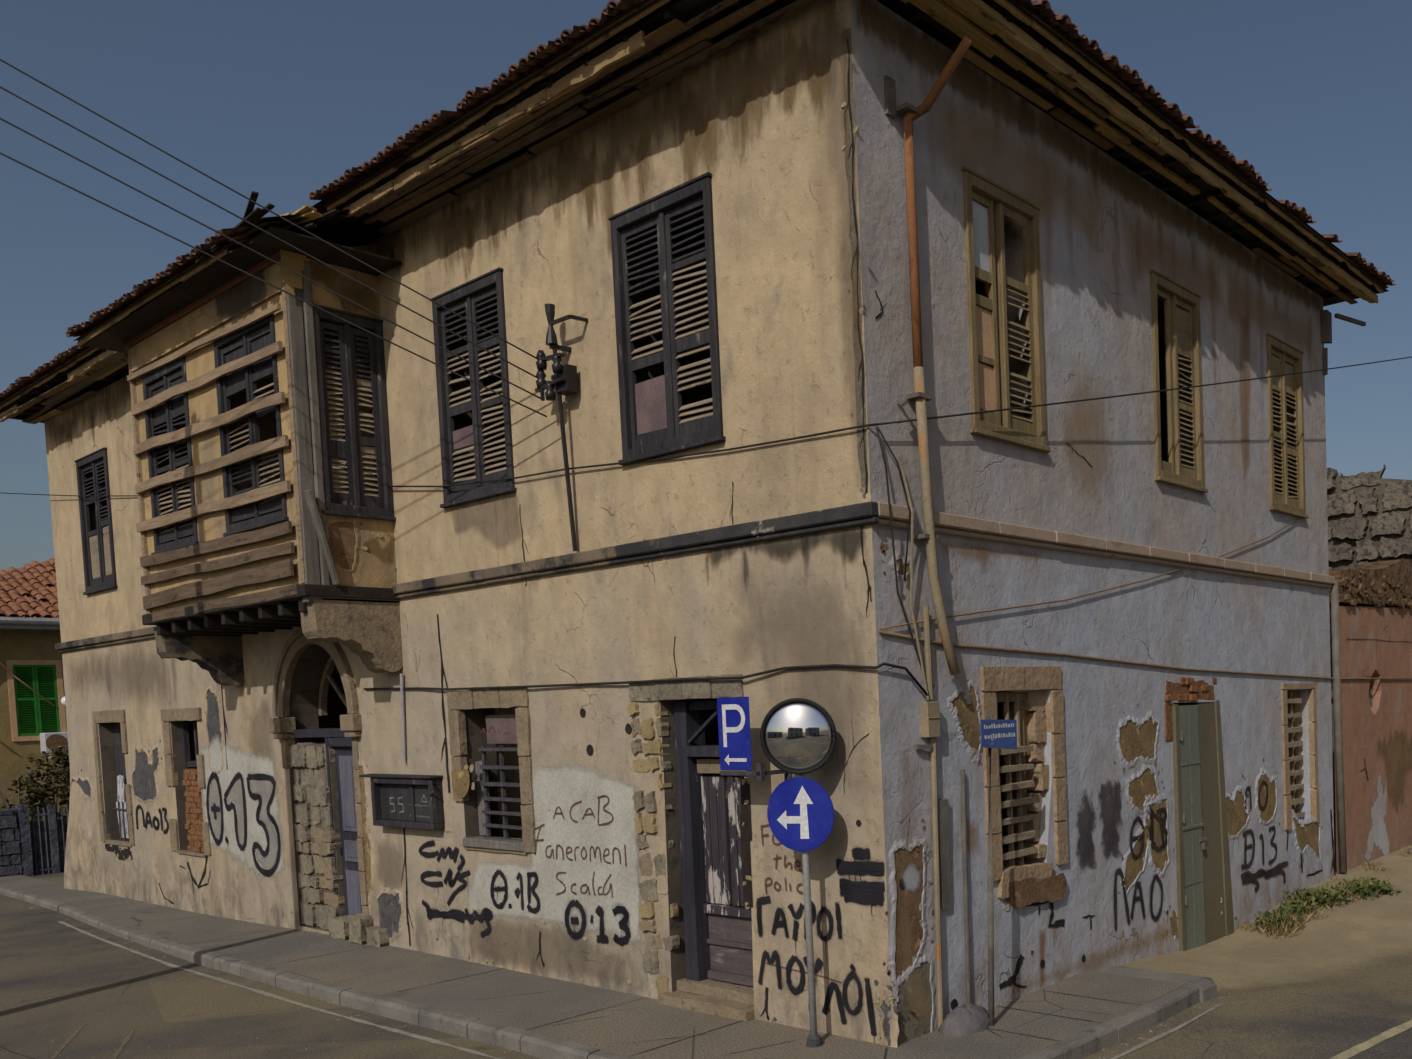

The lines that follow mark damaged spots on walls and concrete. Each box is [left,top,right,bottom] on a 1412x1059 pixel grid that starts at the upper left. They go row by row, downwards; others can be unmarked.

damp [388,3,842,269]
damp [858,0,1320,309]
spalling [874,819,958,1048]
spalling [946,678,983,766]
spalling [1003,871,1067,911]
spalling [1114,704,1174,897]
spalling [1225,758,1323,868]